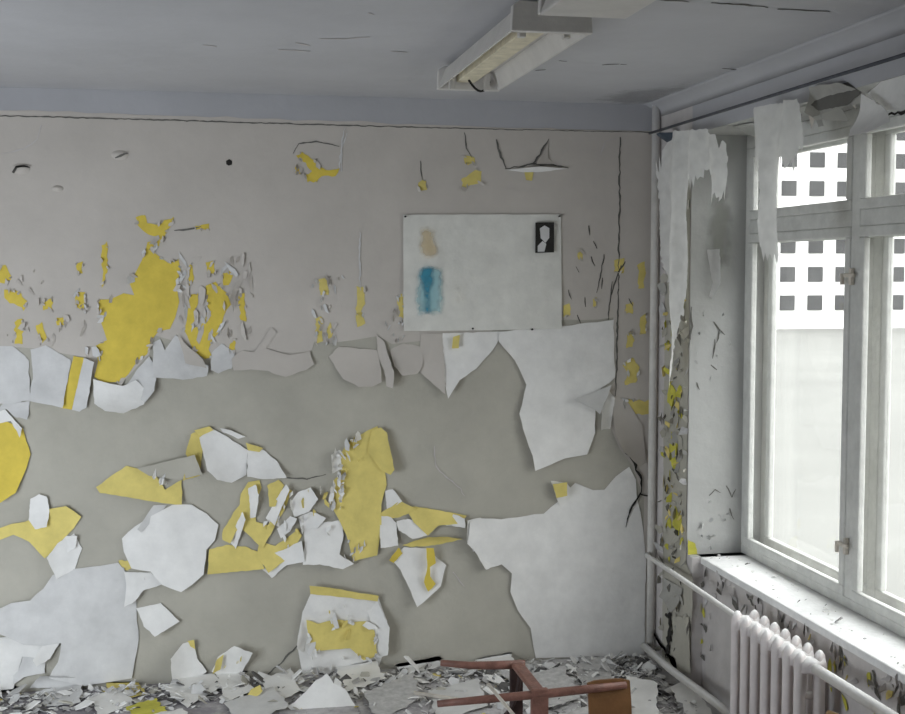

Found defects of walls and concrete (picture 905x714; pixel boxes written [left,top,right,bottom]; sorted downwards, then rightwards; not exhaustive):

peeling [800,75,905,136]
peeling [293,127,347,183]
peeling [460,132,484,192]
crack [0,115,646,396]
peeling [0,182,814,714]
crack [625,453,648,526]
peeling [827,642,905,714]